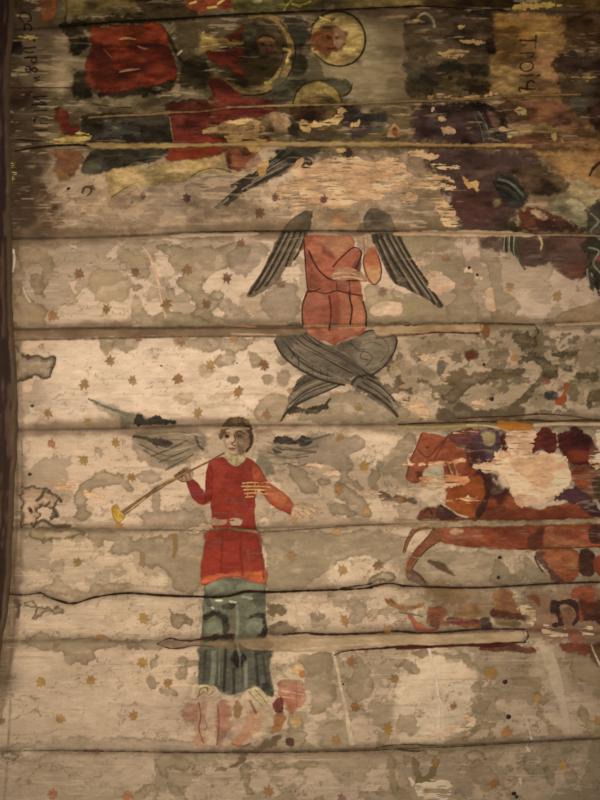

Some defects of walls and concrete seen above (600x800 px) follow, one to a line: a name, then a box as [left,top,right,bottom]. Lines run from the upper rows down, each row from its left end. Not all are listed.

peeling [299,107,360,133]
peeling [257,160,269,177]
peeling [276,147,479,211]
peeling [435,200,457,227]
water stain [412,331,600,422]
peeling [588,430,600,470]
peeling [399,429,572,508]
crack [9,582,600,604]
crack [157,634,237,649]
crack [282,628,529,656]